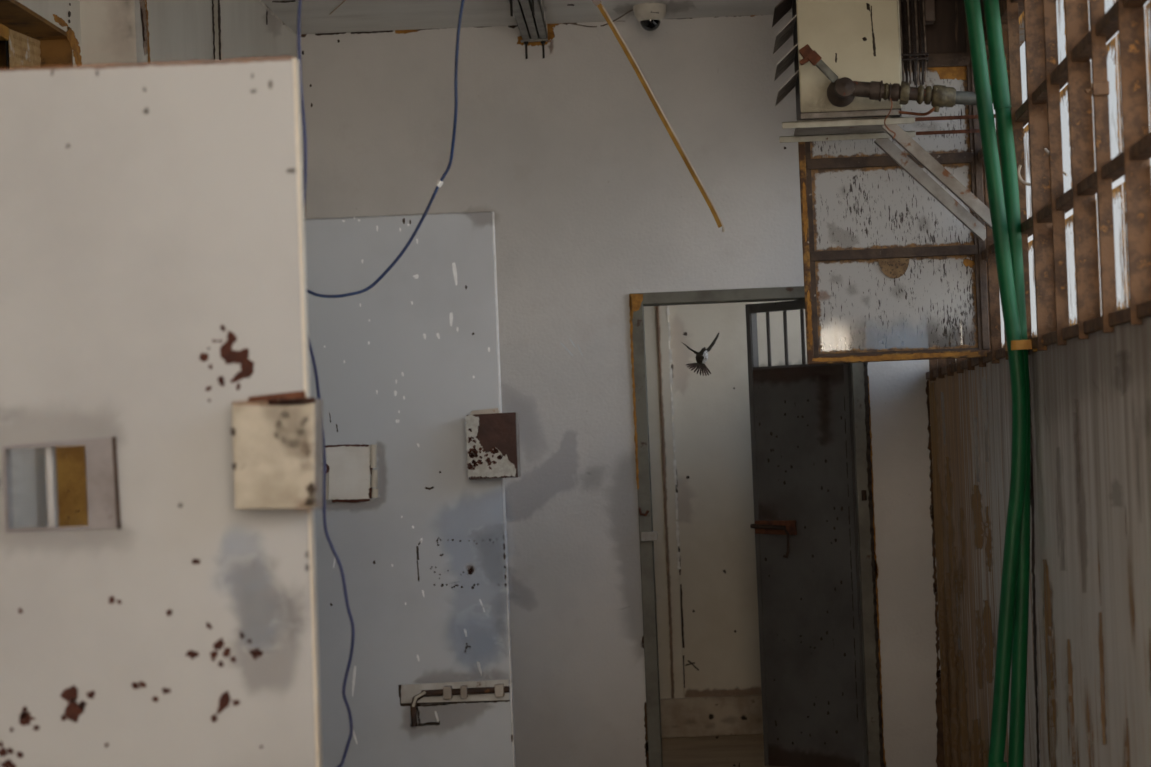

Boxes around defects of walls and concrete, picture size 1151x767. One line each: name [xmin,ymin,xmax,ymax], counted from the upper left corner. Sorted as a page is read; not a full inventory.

corrosion [200,325,254,402]
corrosion [186,622,236,668]
corrosion [240,631,263,660]
corrosion [61,685,95,723]
corrosion [132,681,171,702]
corrosion [210,691,240,723]
corrosion [0,706,39,767]